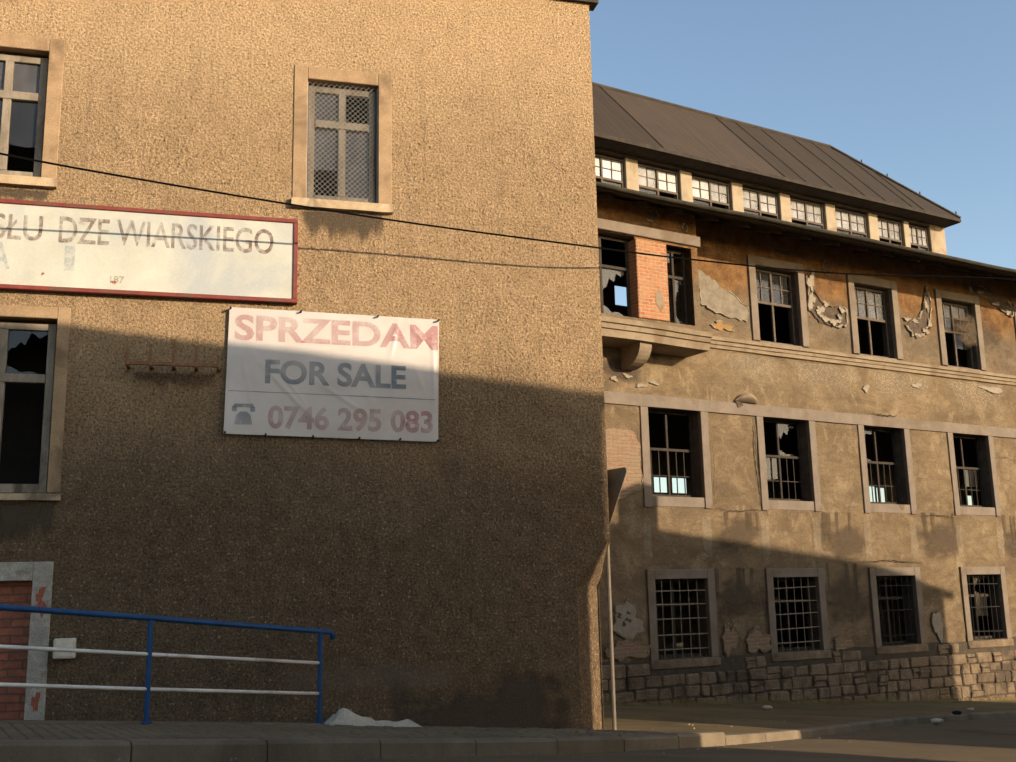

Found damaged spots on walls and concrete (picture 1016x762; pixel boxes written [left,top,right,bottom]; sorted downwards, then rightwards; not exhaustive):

peeling [805,270,848,329]
peeling [903,286,933,339]
peeling [969,282,1014,317]
flaking render [606,428,644,500]
spalling [604,598,652,661]
flaking render [722,622,773,658]